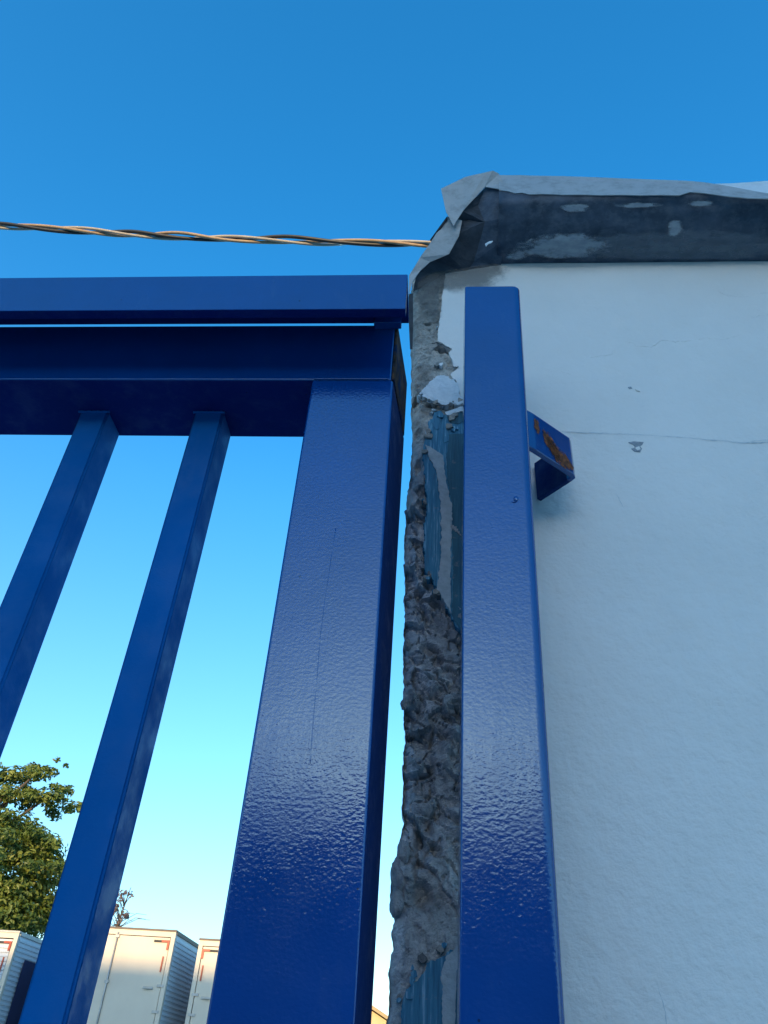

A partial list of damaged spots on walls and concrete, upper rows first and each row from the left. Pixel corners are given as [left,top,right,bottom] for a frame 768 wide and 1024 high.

spalling [386,280,463,1024]
corrosion [534,419,574,470]